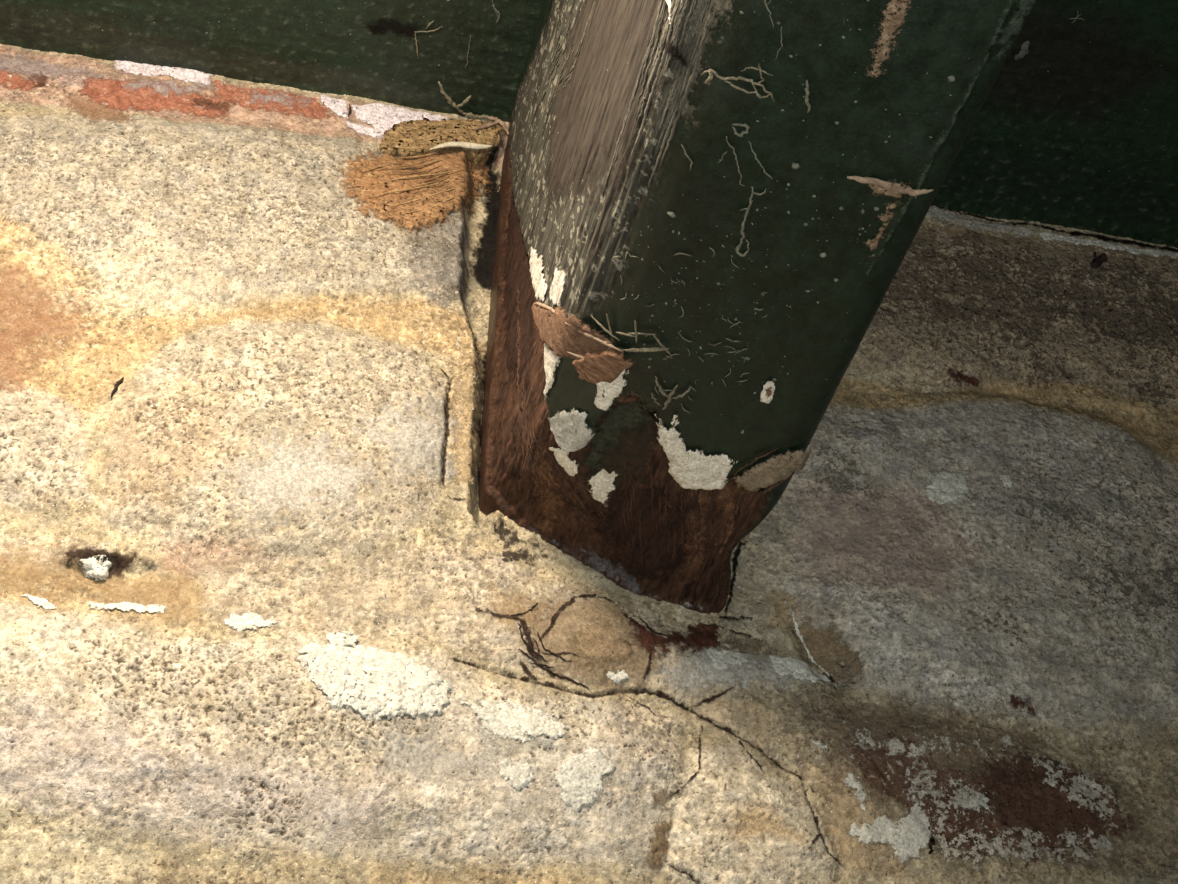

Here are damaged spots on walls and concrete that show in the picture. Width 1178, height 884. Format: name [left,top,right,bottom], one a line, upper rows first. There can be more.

peeling [529,247,566,307]
peeling [543,343,561,399]
peeling [760,381,775,404]
peeling [548,370,629,507]
peeling [655,414,812,492]
crack [452,658,842,865]